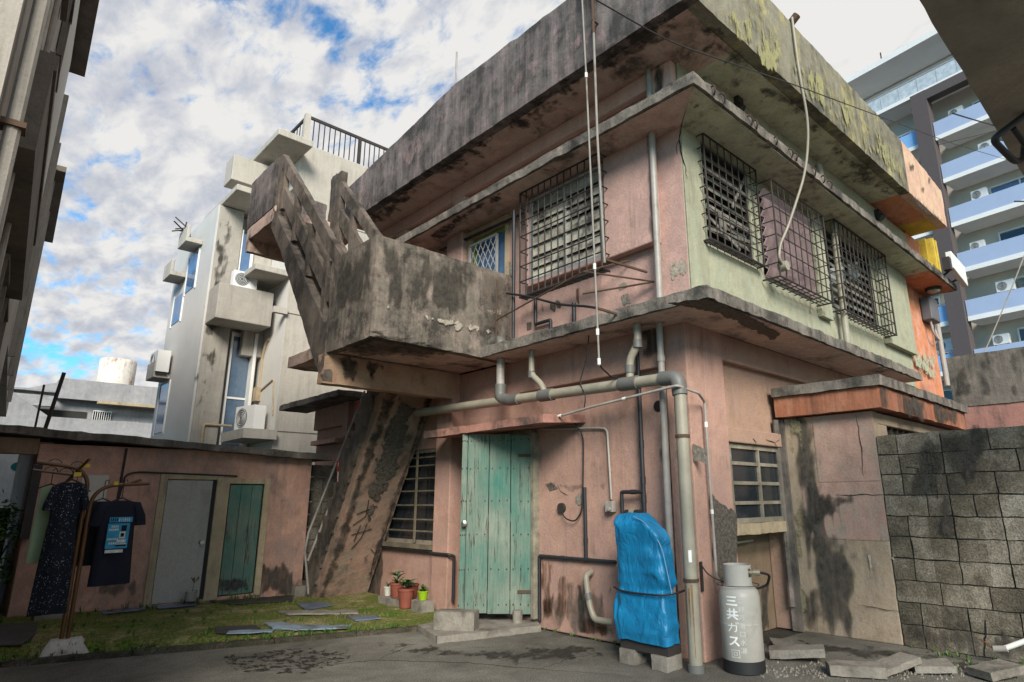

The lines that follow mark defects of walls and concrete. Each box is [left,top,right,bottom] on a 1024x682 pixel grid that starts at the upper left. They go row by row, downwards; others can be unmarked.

leakage [602,19,675,70]
leakage [384,240,401,305]
leakage [422,254,466,310]
peeling [425,314,491,334]
spalling [668,299,783,340]
crack [845,417,885,496]
leakage [320,393,396,598]
leakage [365,398,432,595]
spalling [709,494,737,585]
leakage [788,417,898,659]
rust [541,571,566,616]
rust [584,619,607,636]